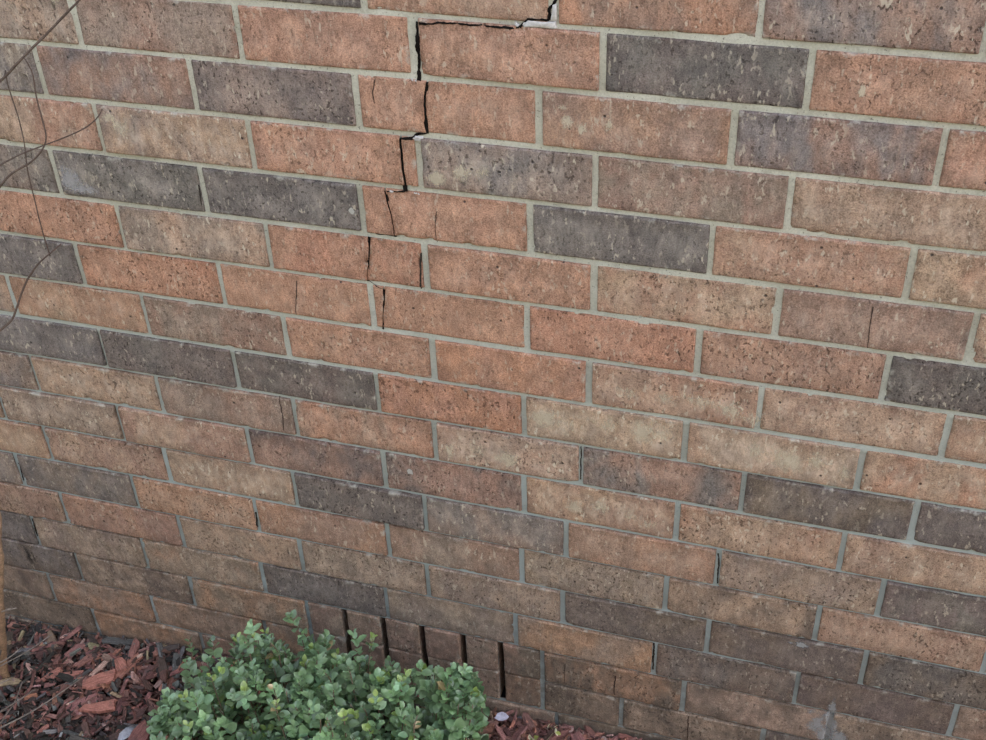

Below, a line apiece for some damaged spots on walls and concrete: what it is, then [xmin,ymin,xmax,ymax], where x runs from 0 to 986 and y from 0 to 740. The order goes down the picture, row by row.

crack [367,0,557,329]